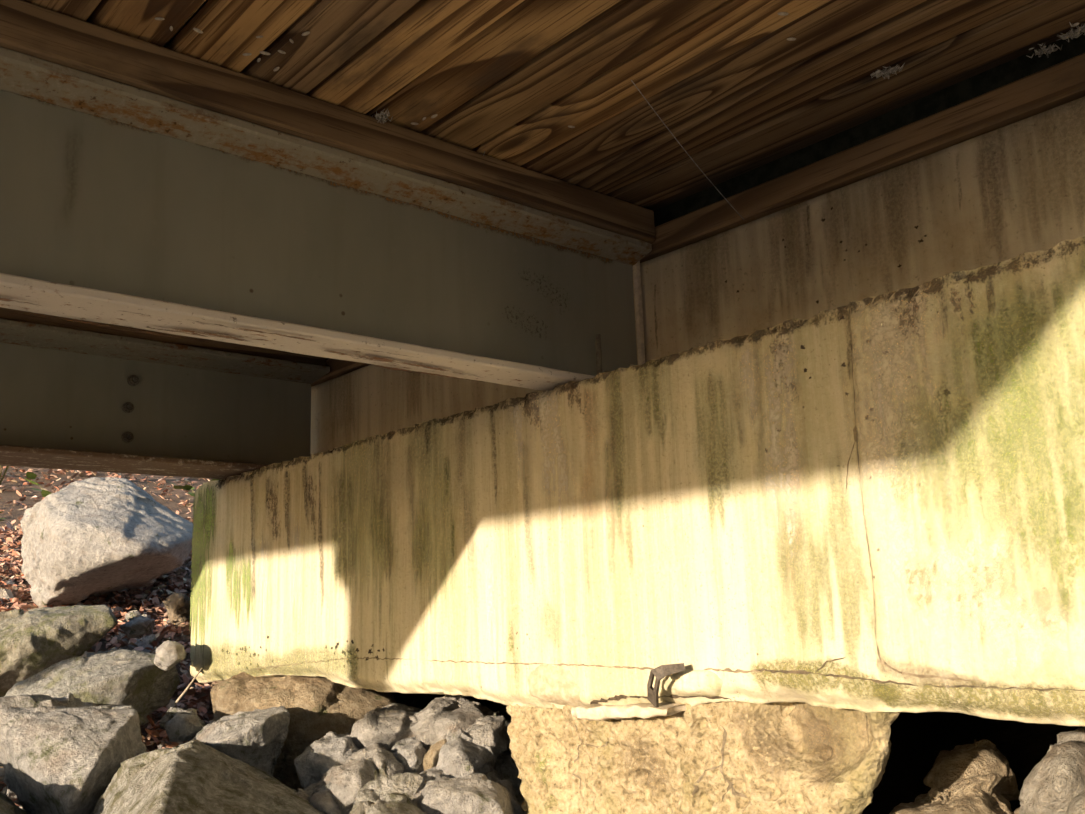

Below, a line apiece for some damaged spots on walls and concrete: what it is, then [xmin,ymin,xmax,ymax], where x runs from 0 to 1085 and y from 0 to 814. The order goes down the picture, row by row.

water stain [190,487,215,650]
water stain [226,481,267,624]
water stain [303,468,323,594]
water stain [781,515,864,643]
water stain [848,285,1083,669]